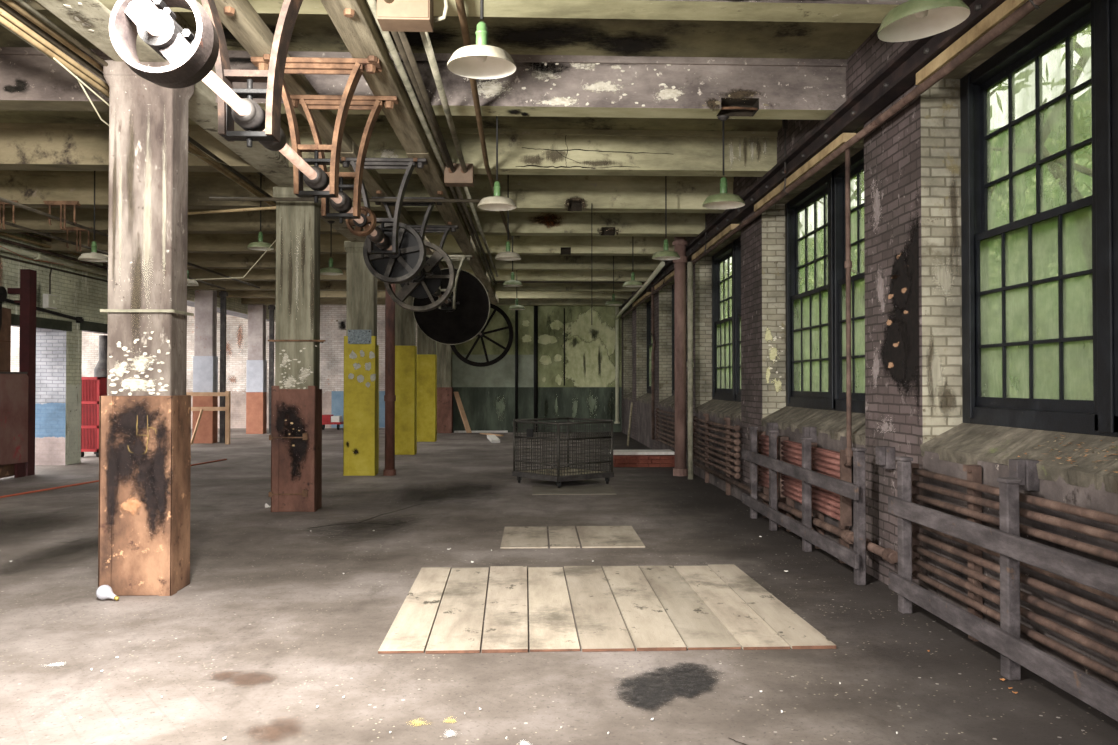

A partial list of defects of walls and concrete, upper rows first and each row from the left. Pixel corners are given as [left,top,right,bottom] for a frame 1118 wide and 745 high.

peeling [471,62,685,116]
peeling [870,179,883,231]
peeling [874,265,907,325]
peeling [108,331,170,396]
peeling [279,345,317,389]
peeling [348,350,376,388]
peeling [871,351,894,389]
peeling [876,415,895,435]
rust [120,498,140,515]